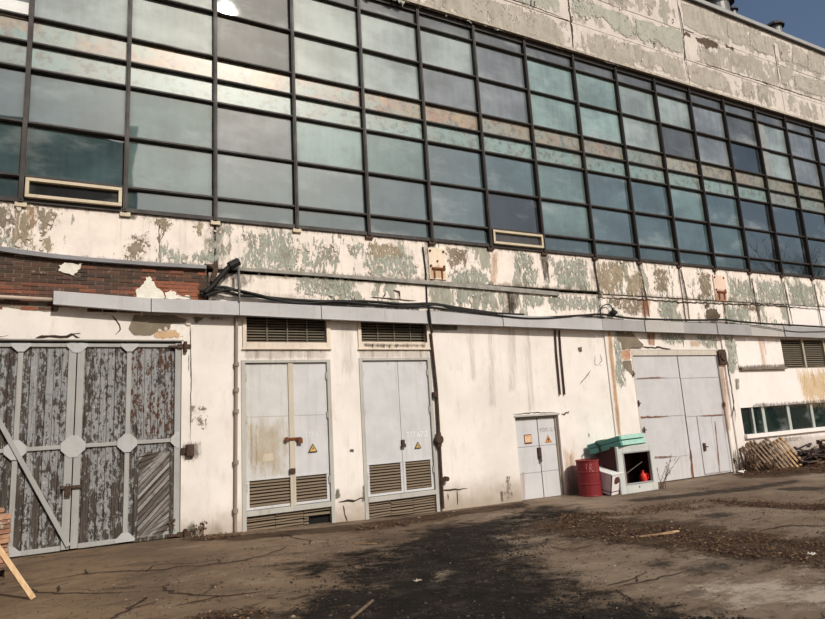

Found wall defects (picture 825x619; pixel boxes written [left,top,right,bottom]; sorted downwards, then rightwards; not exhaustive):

flaking render [0,201,223,312]